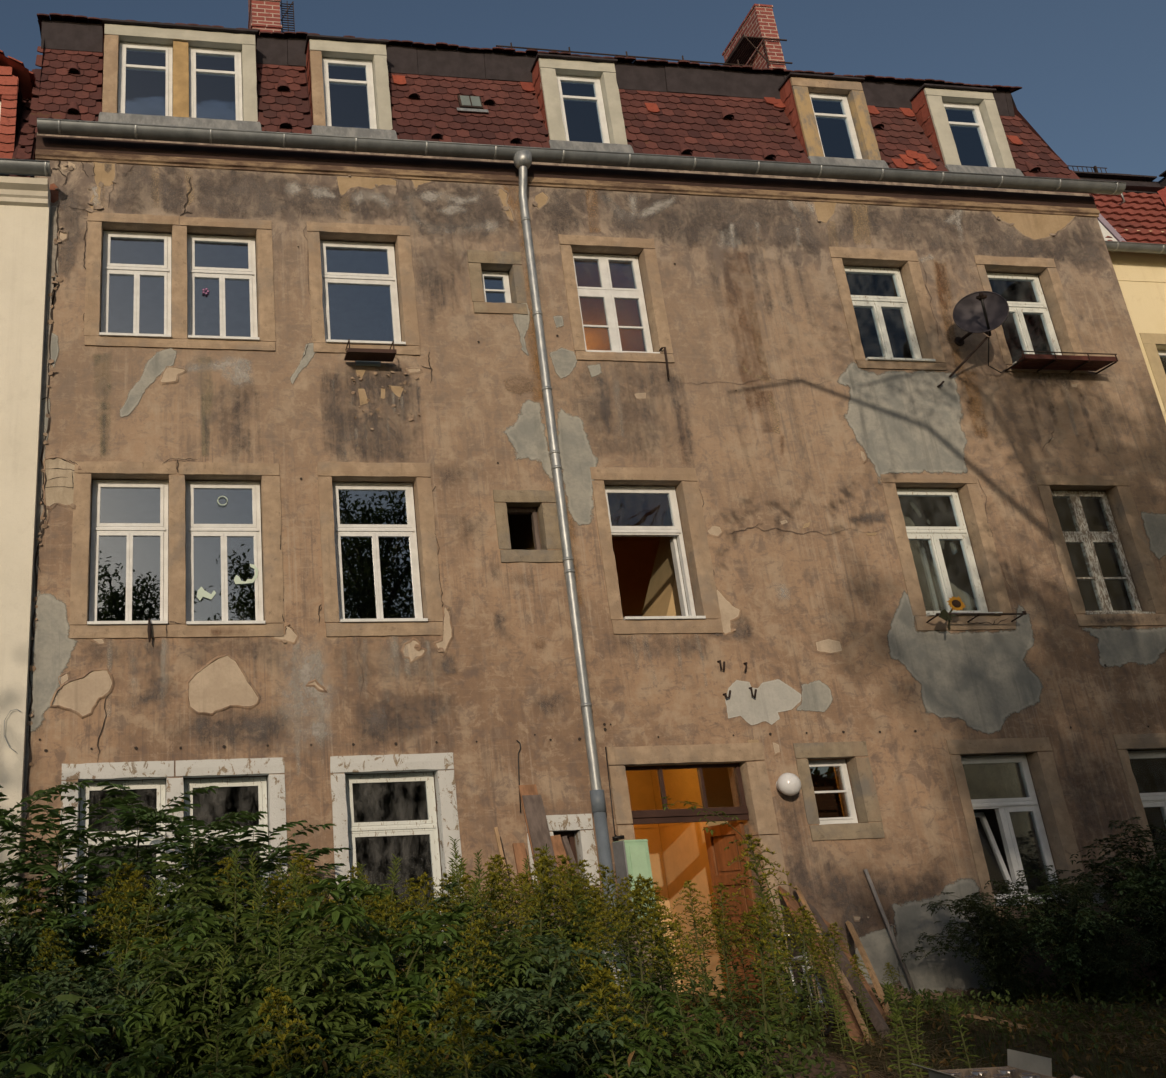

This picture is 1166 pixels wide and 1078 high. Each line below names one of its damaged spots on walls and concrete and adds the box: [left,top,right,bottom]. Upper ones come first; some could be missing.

spalling [60,161,77,172]
spalling [85,162,117,213]
spalling [987,202,1077,242]
spalling [158,366,188,386]
spalling [22,183,82,820]
crack [37,458,78,572]
spalling [50,668,115,719]